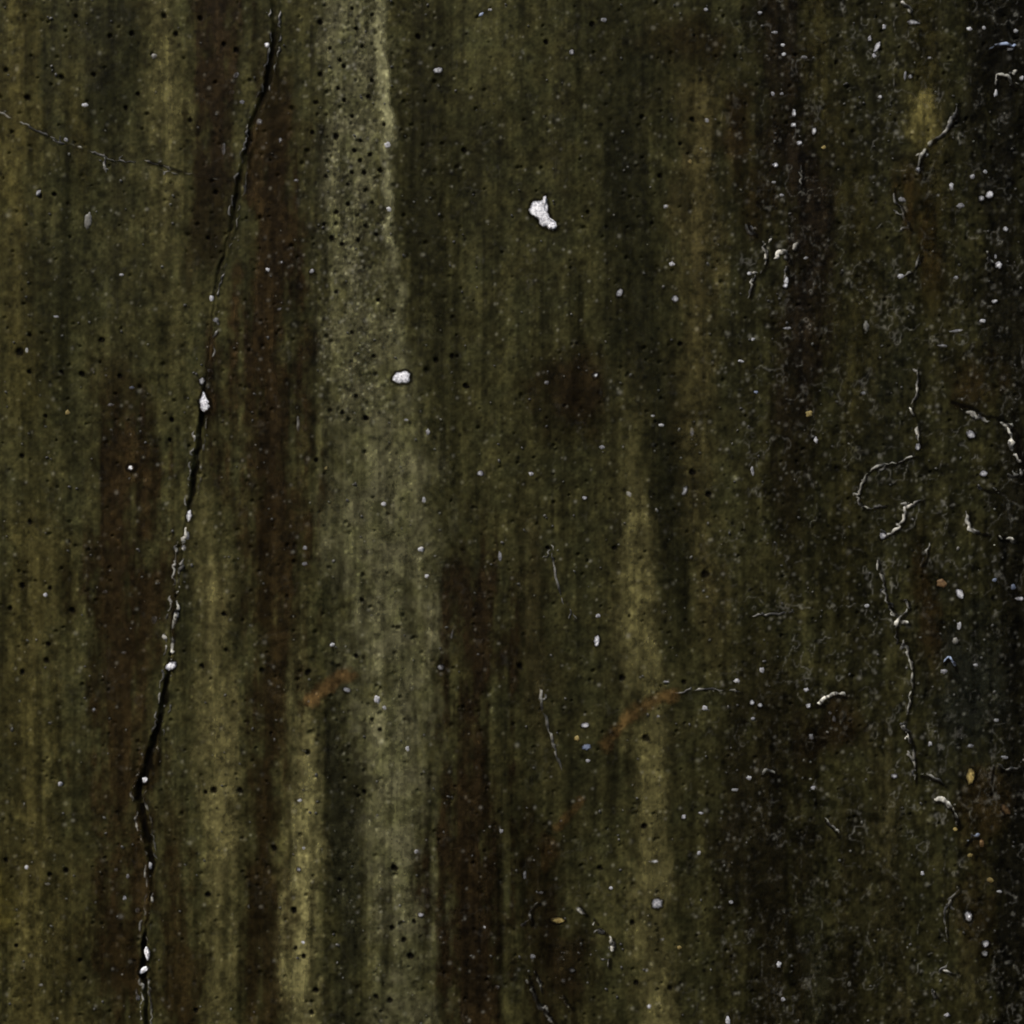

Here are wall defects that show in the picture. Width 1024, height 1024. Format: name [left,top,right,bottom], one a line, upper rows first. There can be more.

leakage [0,517,76,1024]
crack [0,9,282,1024]
leakage [274,0,467,1024]
leakage [600,0,692,1024]
leakage [705,677,873,1024]
leakage [758,0,840,509]
crack [853,369,925,537]
crack [876,560,917,783]
crack [893,188,923,277]
crack [915,103,961,172]
crack [951,401,1024,545]
leakage [960,0,1024,1024]